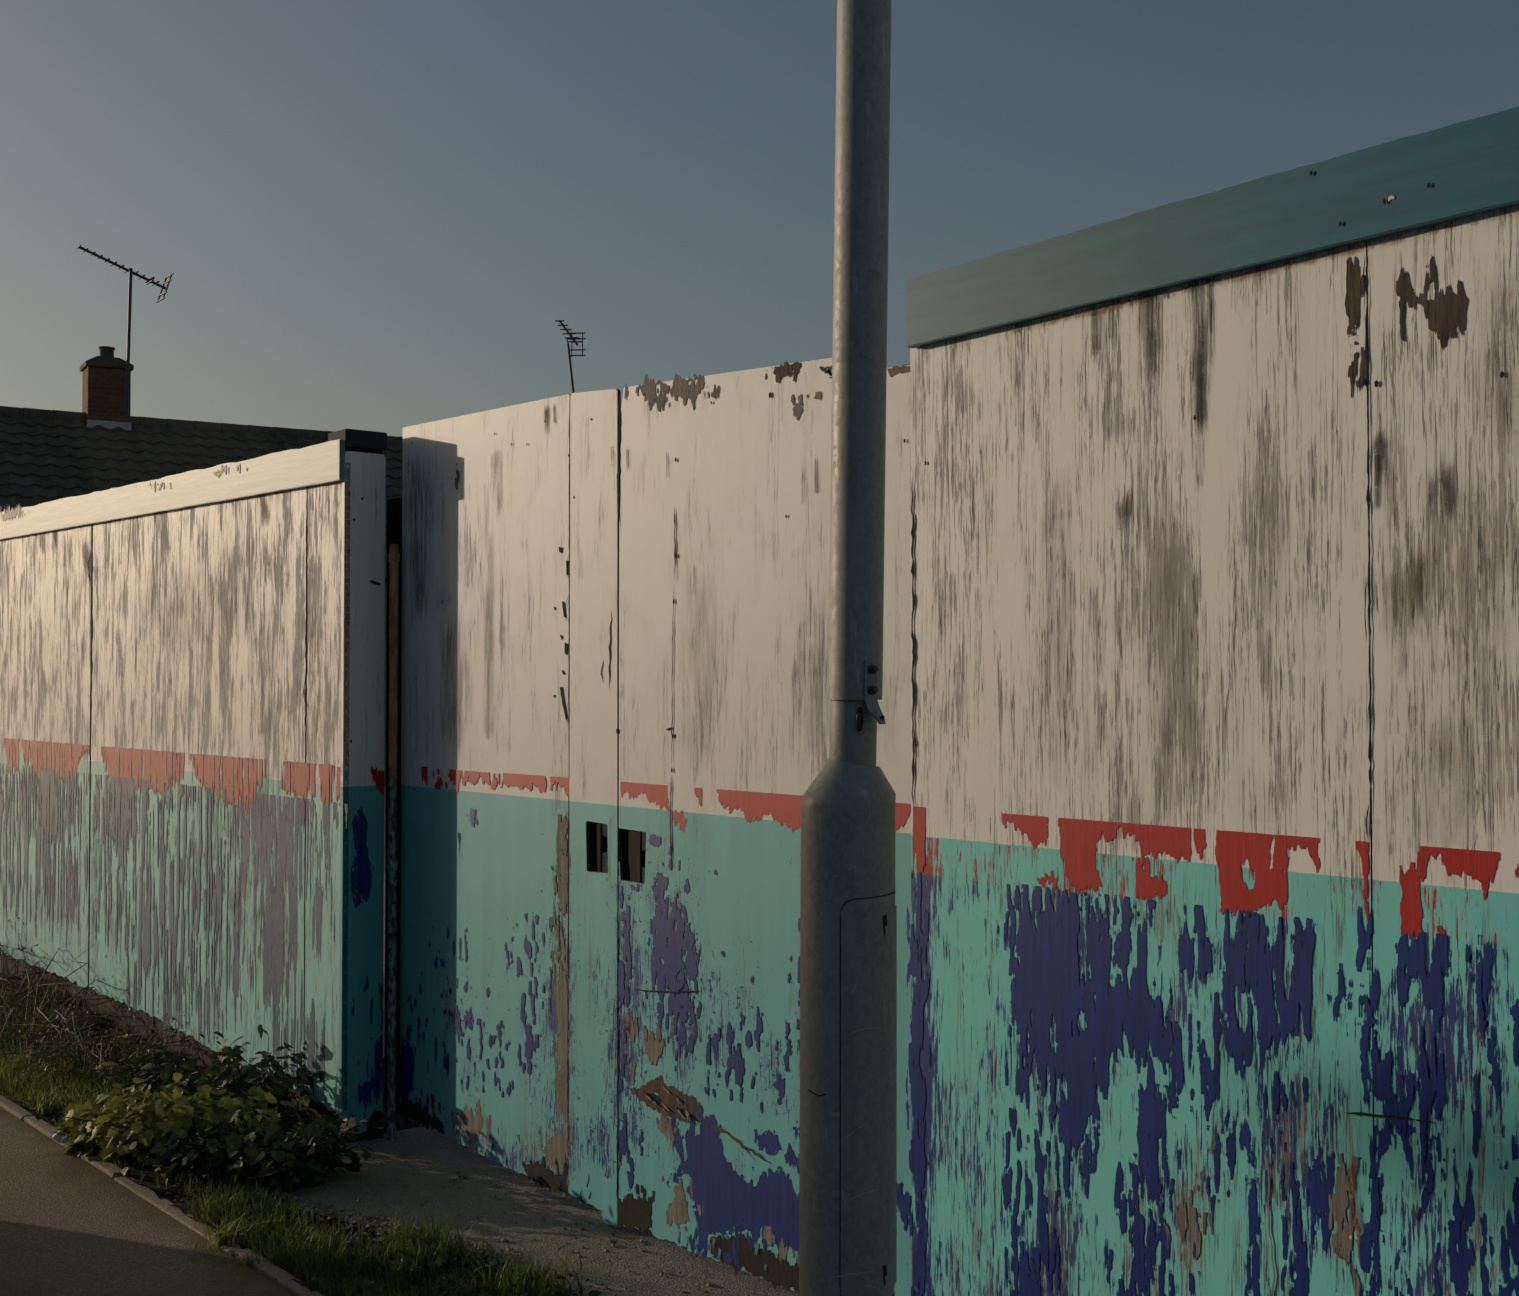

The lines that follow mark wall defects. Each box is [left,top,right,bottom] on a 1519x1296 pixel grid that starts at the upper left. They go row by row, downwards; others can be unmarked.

leakage [1140,291,1160,368]
leakage [1189,278,1211,426]
peeling [1345,256,1368,398]
peeling [1396,255,1468,349]
leakage [82,545,92,584]
leakage [259,494,269,524]
leakage [1374,432,1386,507]
leakage [1427,467,1453,516]
peeling [0,738,374,1096]
peeling [351,766,803,1275]
peeling [895,803,930,1296]
peeling [997,813,1519,1296]